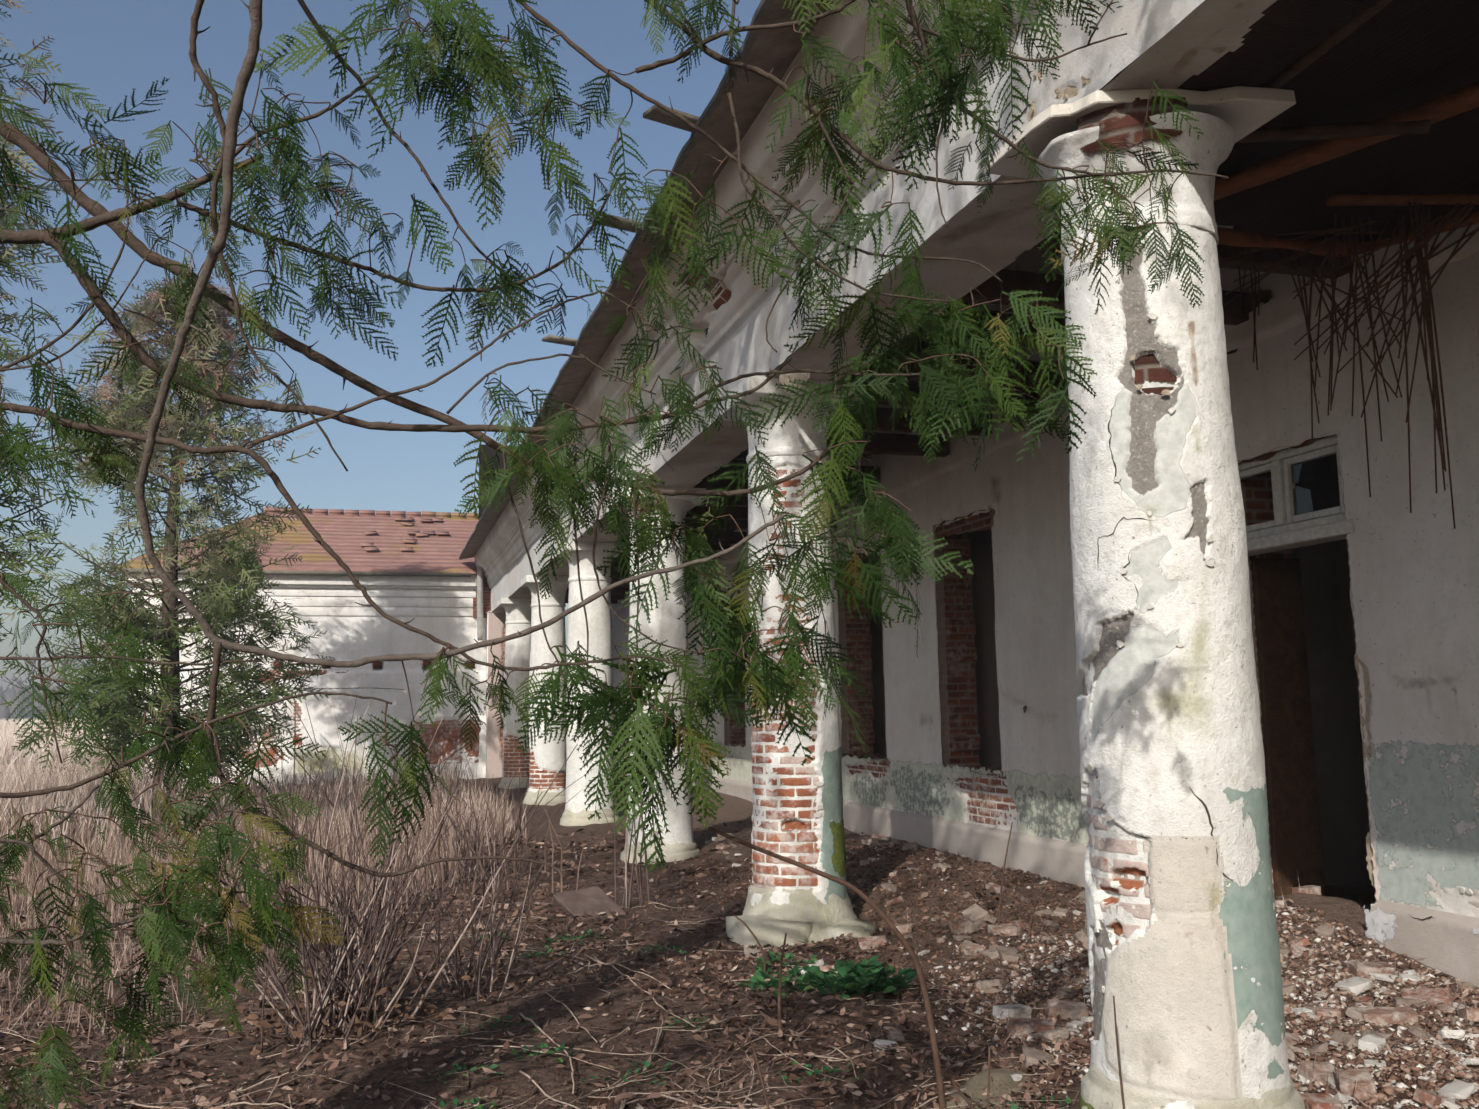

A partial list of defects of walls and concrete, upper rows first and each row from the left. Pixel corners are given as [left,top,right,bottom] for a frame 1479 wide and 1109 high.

spalling [779,369,810,390]
crack [1097,405,1151,603]
spalling [1082,226,1215,745]
spalling [691,464,1151,1040]
peeling [1219,784,1285,1047]
peeling [1354,653,1479,944]